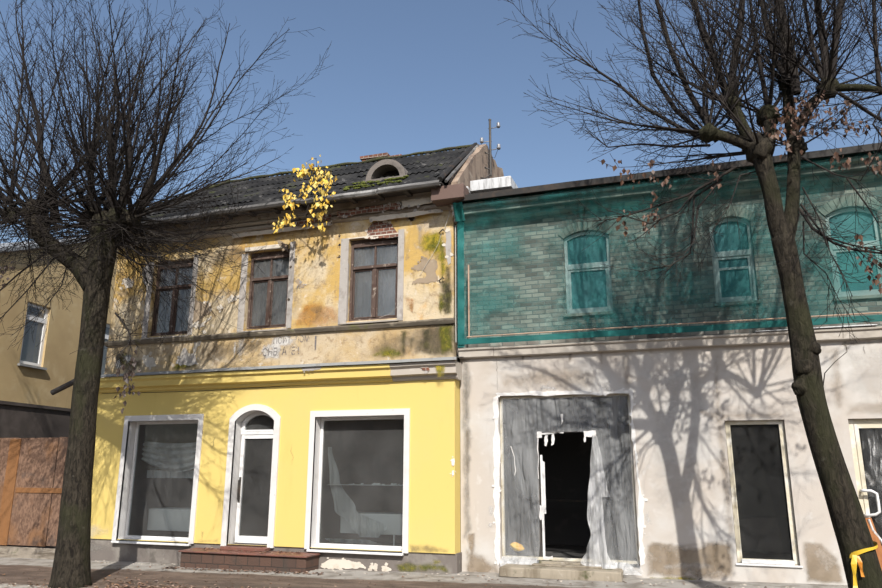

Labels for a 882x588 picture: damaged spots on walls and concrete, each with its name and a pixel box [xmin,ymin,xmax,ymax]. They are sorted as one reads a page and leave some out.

spalling [364,197,443,239]
peeling [411,229,453,284]
flaking render [176,295,239,366]
leakage [418,268,452,353]
flaking render [321,557,392,571]